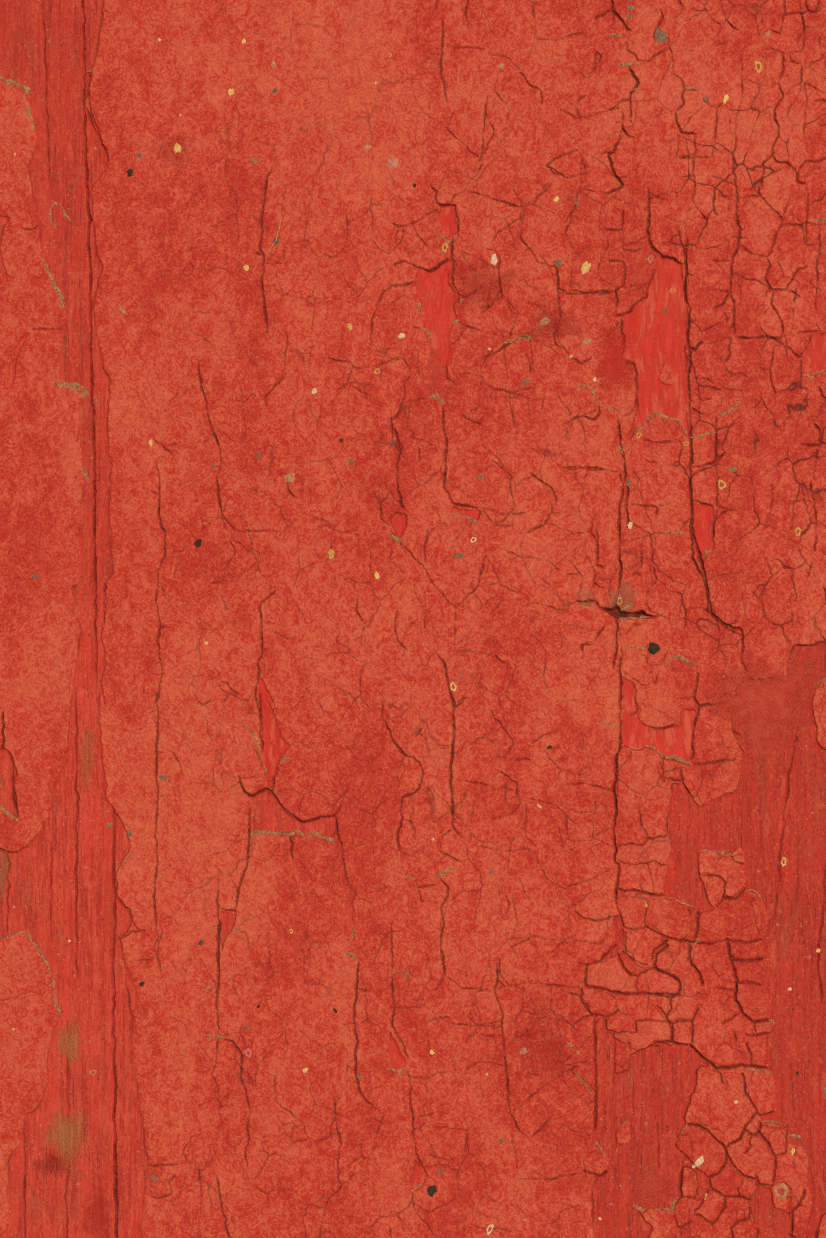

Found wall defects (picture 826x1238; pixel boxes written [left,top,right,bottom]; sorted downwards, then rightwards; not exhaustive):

crack [41,0,52,192]
peeling [0,0,149,1238]
crack [49,0,111,980]
crack [111,436,357,1238]
crack [195,350,280,584]
crack [251,163,288,412]
peeling [205,679,385,1153]
peeling [387,923,435,1237]
peeling [390,183,481,404]
crack [321,0,826,1182]
peeling [613,188,716,445]
peeling [564,485,826,1238]